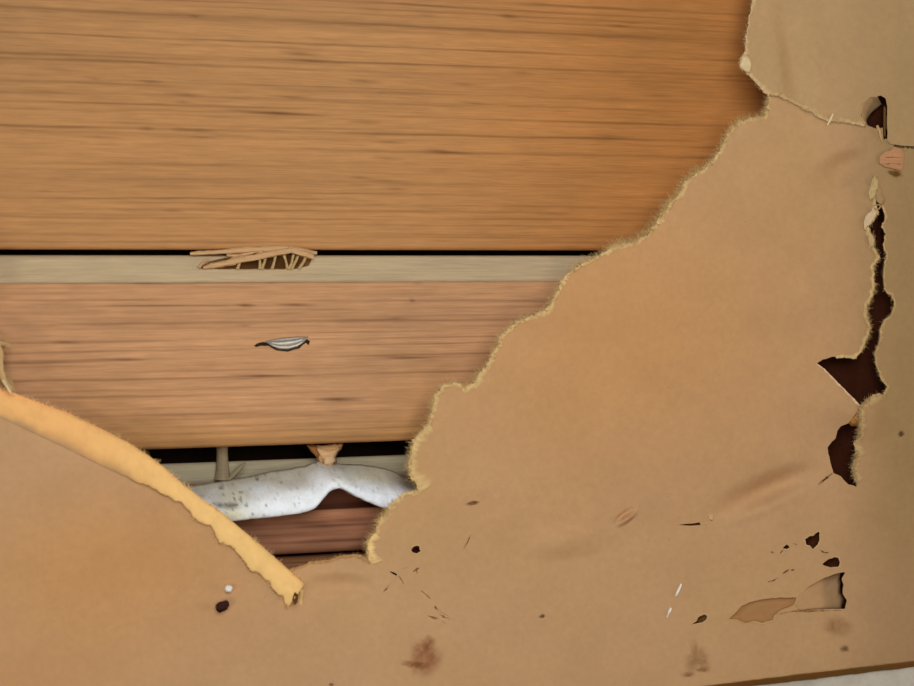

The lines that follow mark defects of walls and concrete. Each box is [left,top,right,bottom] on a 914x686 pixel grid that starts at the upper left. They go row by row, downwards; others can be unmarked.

peeling [740,56,752,72]
spalling [199,255,311,269]
peeling [215,600,229,613]
peeling [727,596,799,626]